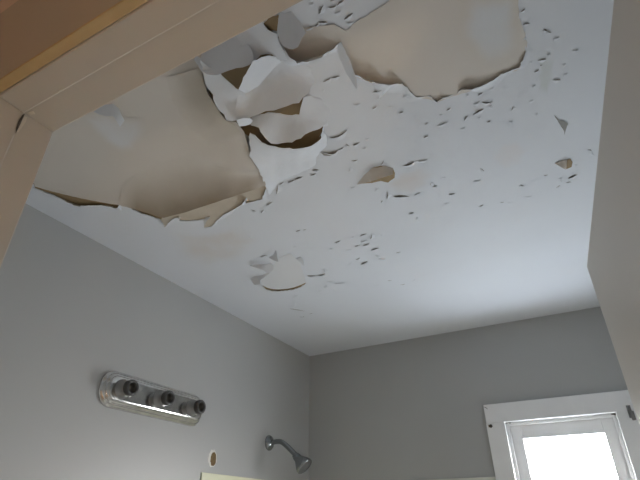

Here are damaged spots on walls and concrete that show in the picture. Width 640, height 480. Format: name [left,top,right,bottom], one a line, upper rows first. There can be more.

peeling [33,0,550,229]
peeling [555,159,578,188]
peeling [250,246,327,319]